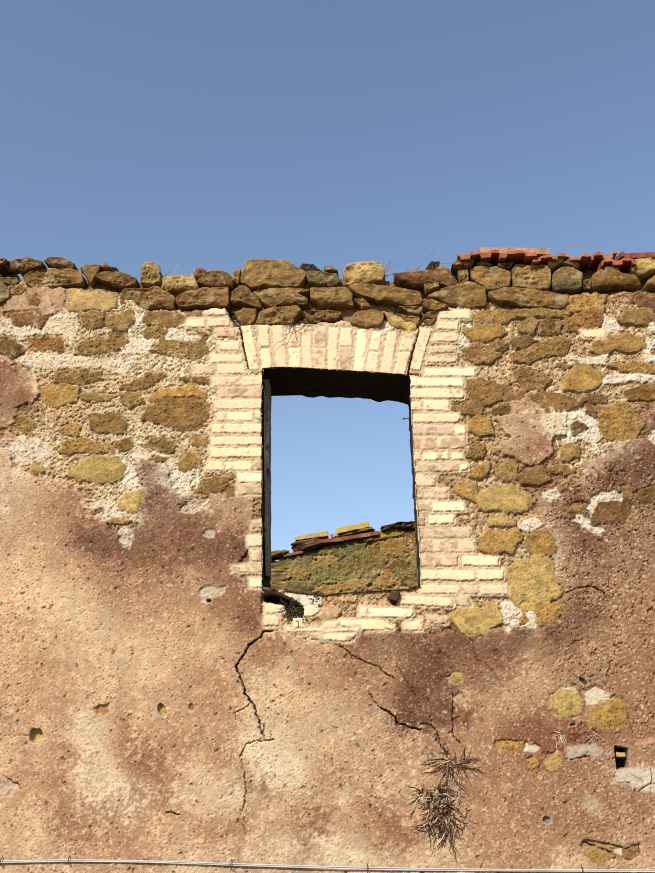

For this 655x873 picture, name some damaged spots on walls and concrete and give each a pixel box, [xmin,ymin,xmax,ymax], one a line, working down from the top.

peeling [0,279,655,648]
crack [340,630,416,695]
crack [235,630,275,836]
crack [369,693,461,757]
spalling [494,739,604,773]
spalling [548,683,632,728]